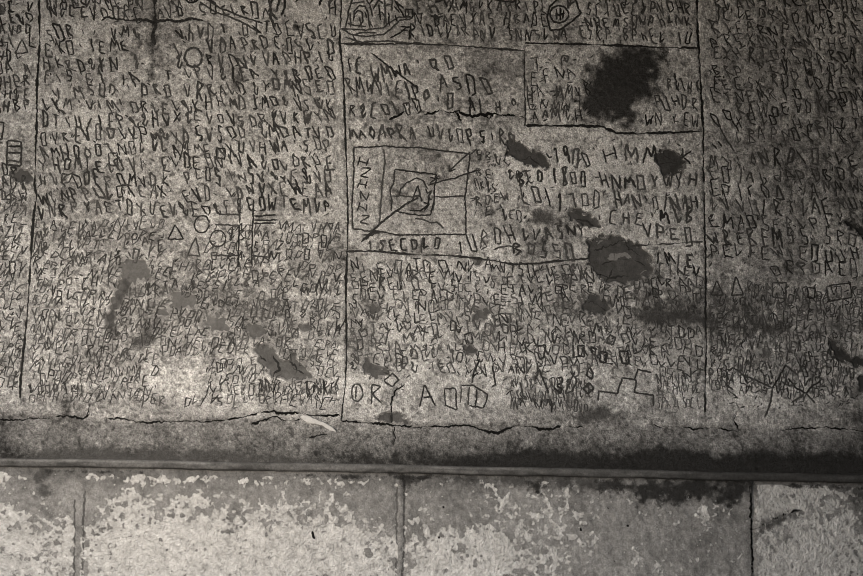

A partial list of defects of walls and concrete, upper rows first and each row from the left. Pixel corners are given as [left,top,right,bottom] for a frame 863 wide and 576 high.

water stain [575,45,668,128]
crack [0,381,583,445]
crack [654,413,741,432]
crack [782,425,863,433]